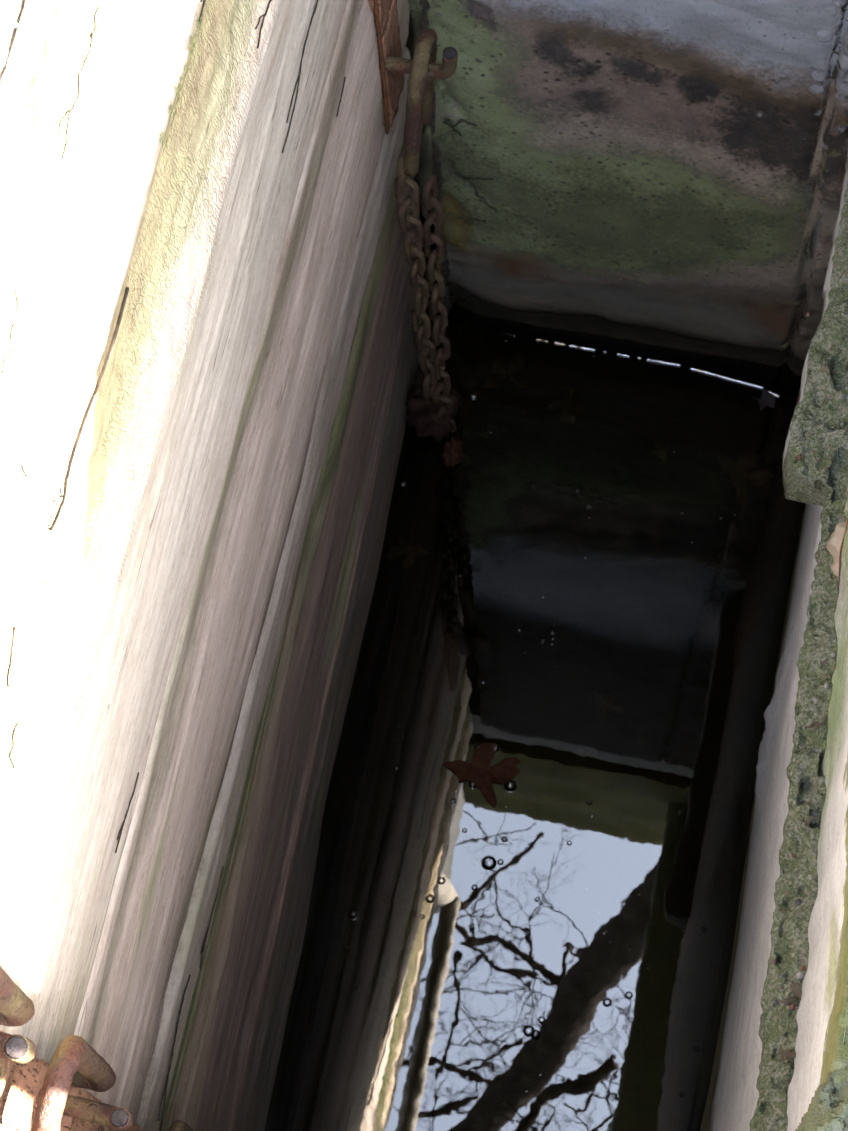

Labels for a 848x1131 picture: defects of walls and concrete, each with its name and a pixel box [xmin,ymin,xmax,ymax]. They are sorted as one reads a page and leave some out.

crack [0,0,32,108]
crack [58,6,100,159]
crack [255,0,272,49]
crack [282,0,319,153]
corrosion [374,0,390,135]
damp [458,0,848,293]
crack [0,288,19,376]
crack [49,287,129,531]
crack [6,627,16,687]